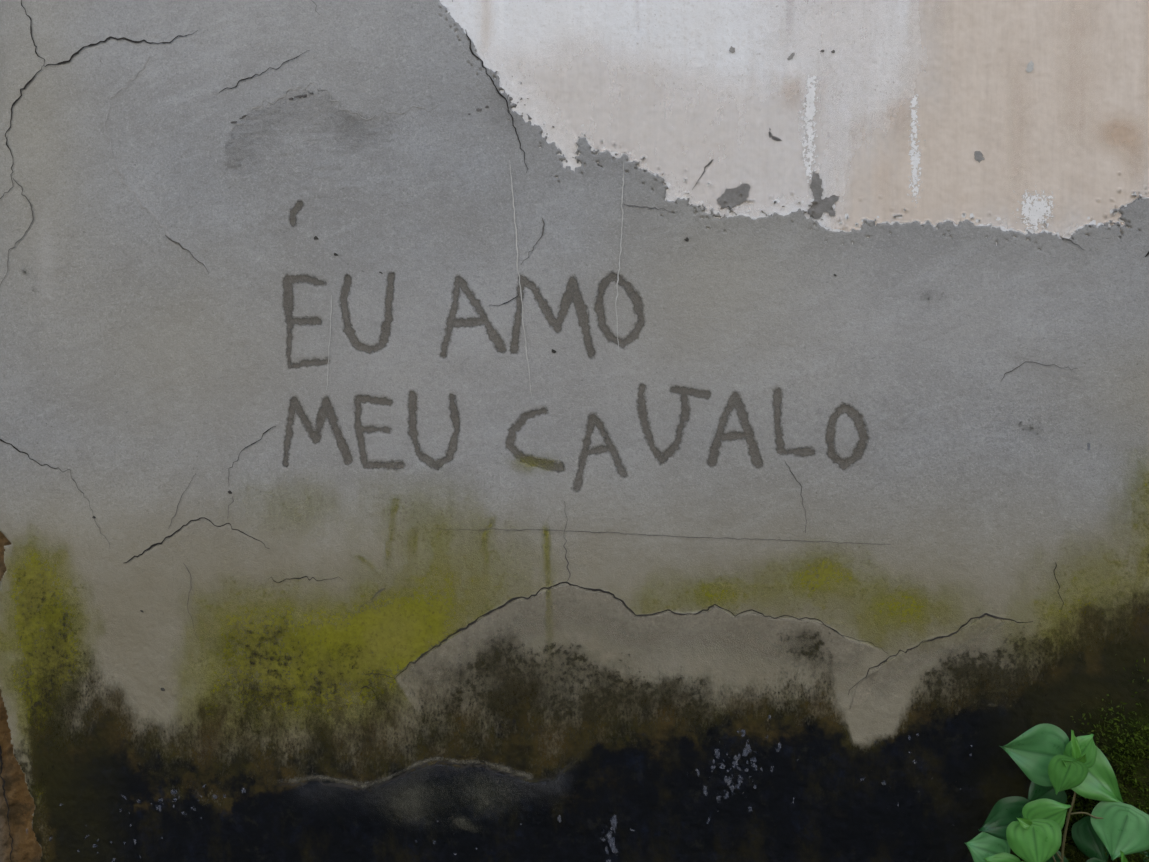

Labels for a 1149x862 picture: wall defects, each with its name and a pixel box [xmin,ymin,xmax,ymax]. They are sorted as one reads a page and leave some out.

crack [0,0,198,285]
crack [466,32,528,173]
water stain [845,0,1149,232]
spalling [0,531,11,581]
crack [0,426,276,563]
crack [270,575,343,583]
crack [362,462,1033,710]
spalling [0,689,42,862]
water stain [14,574,1149,862]